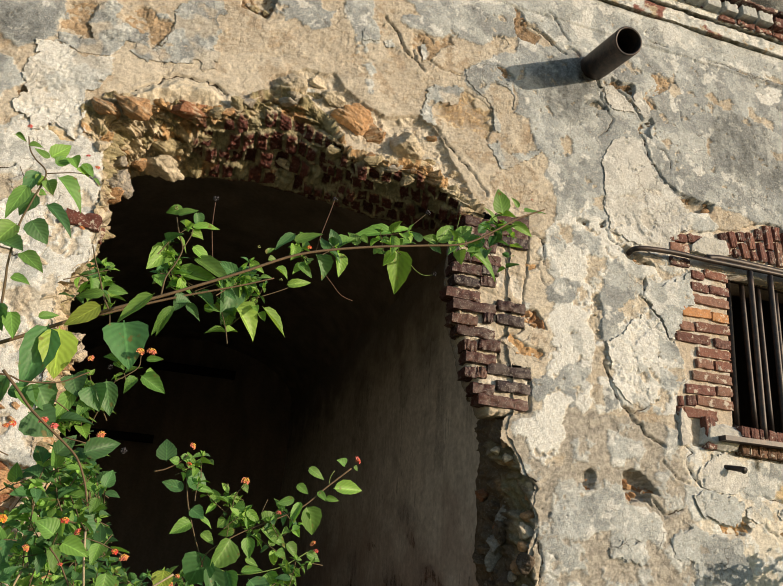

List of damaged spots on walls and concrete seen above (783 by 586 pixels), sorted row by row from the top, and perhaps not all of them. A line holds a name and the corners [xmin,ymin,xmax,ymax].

spalling [12,0,546,404]
crack [628,99,686,197]
flaking render [0,428,61,536]
spalling [472,409,540,586]
flaking render [622,472,654,502]
crack [602,362,701,487]